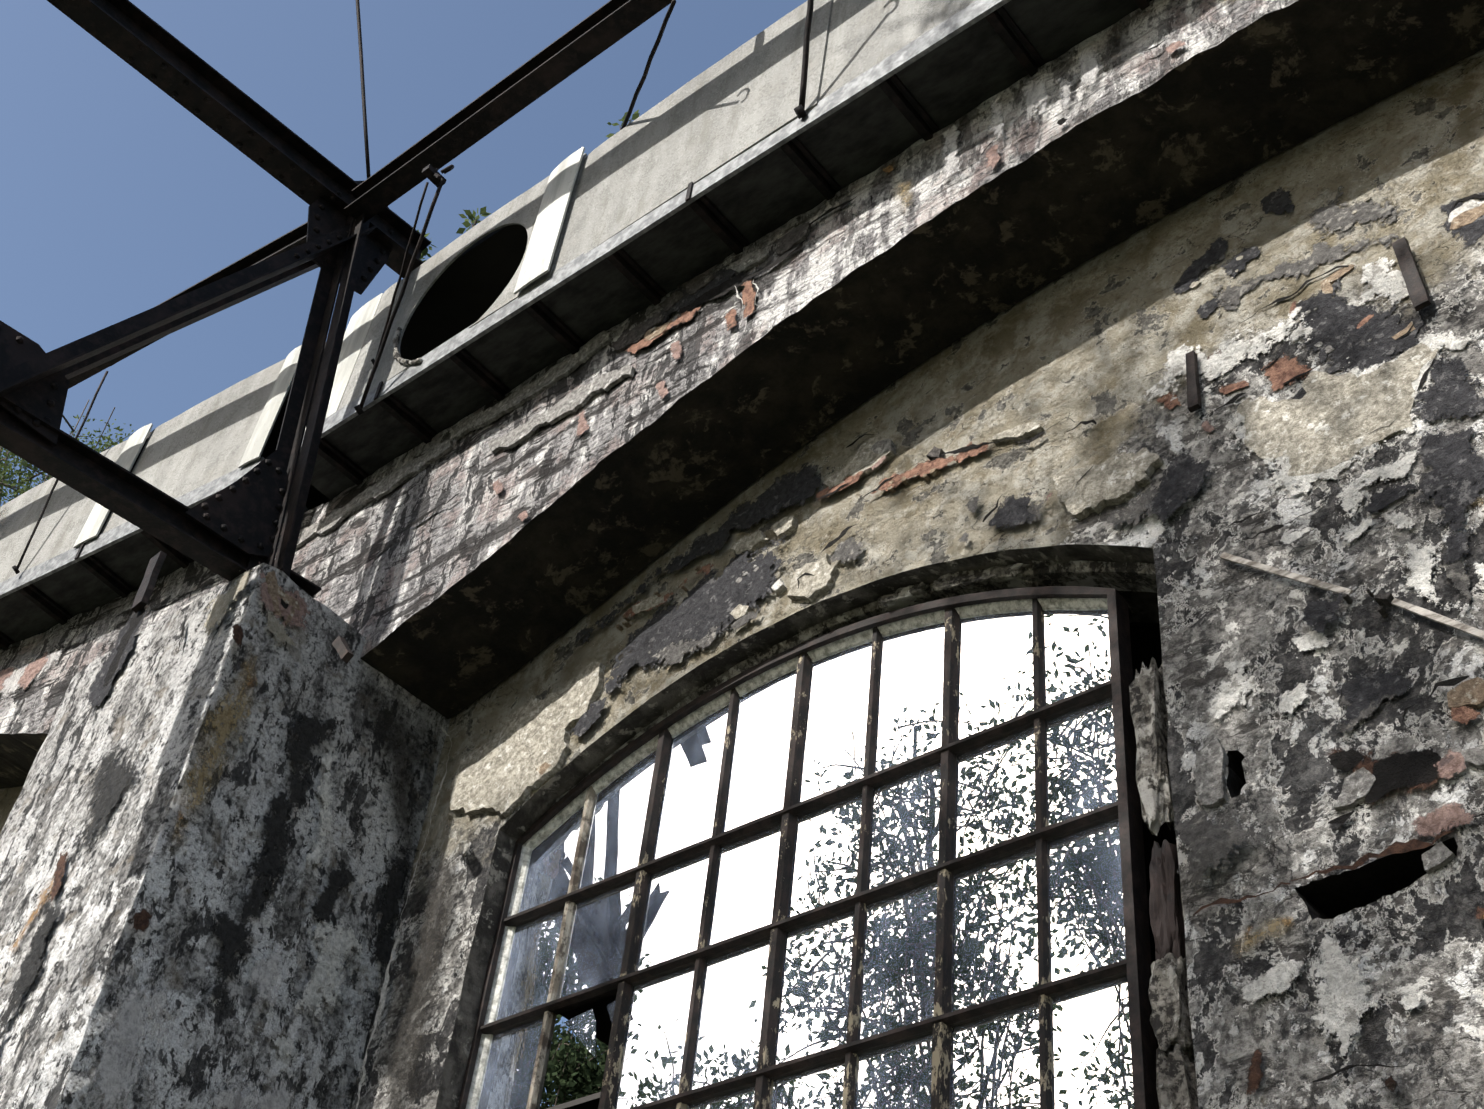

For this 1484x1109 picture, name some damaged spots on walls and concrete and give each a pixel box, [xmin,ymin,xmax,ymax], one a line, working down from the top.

spalling [1434,192,1484,254]
spalling [1173,186,1430,416]
spalling [296,222,811,550]
flaking render [1157,392,1181,410]
spalling [1413,352,1484,423]
spalling [257,562,310,646]
spalling [1327,666,1484,824]
spalling [1412,802,1484,837]